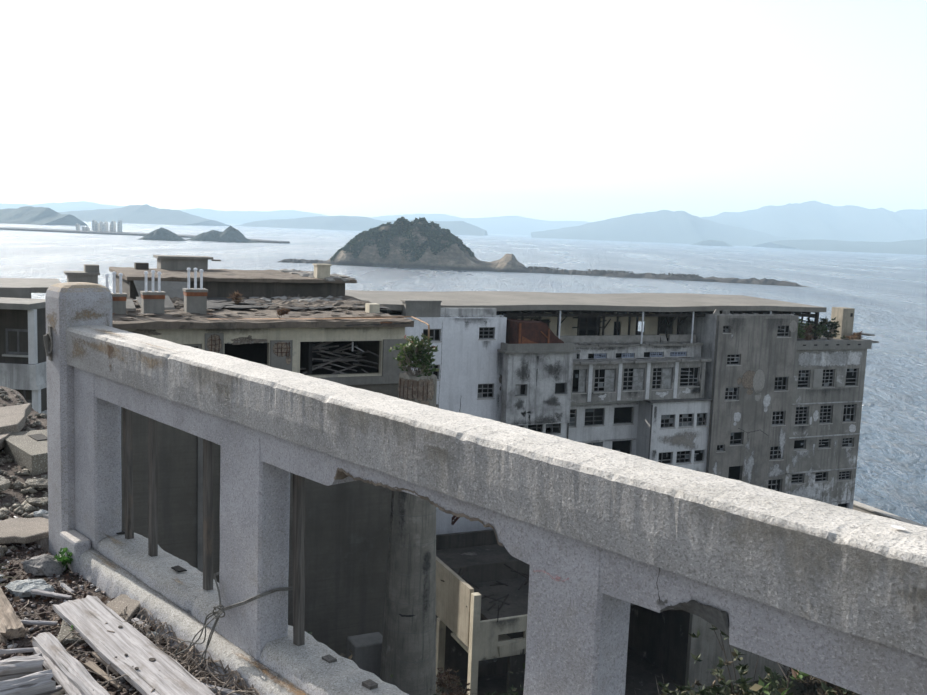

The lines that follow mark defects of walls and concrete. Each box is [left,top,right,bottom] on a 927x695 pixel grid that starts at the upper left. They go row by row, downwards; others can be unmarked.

damp [518,356,561,381]
spalling [753,369,771,412]
damp [514,398,562,425]
damp [663,432,696,448]
spalling [334,467,504,547]